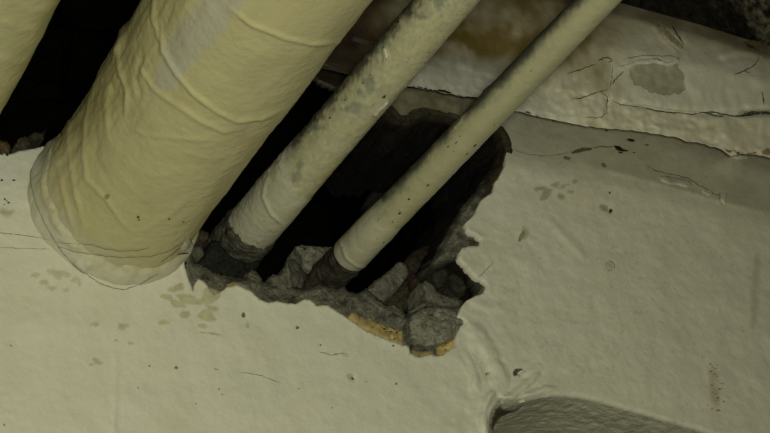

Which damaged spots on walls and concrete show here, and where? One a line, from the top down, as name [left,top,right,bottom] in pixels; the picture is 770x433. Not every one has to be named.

peeling [616,24,685,95]
crack [570,55,770,119]
spalling [323,95,460,197]
spalling [415,126,513,313]
leakage [163,284,220,327]
spalling [179,238,454,357]